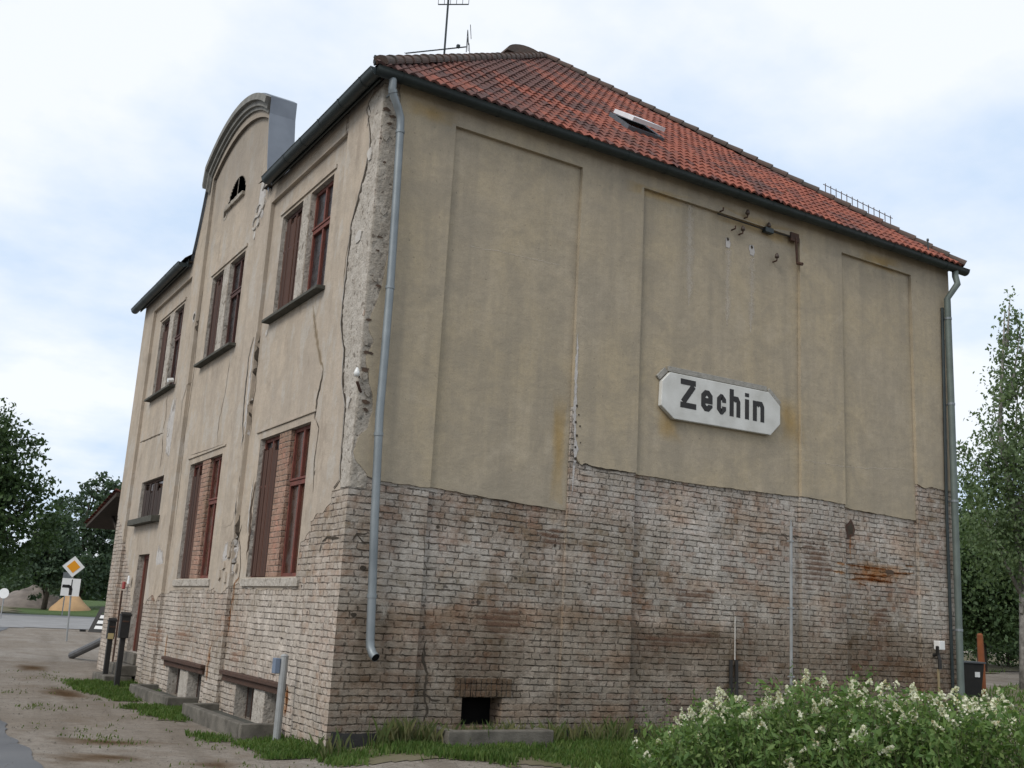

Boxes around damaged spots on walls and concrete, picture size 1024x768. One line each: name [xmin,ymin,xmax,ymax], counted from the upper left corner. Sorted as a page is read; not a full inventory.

crack [140,89,374,526]
spalling [340,86,400,488]
peeling [244,330,268,435]
crack [226,478,242,582]
rust [847,564,915,586]